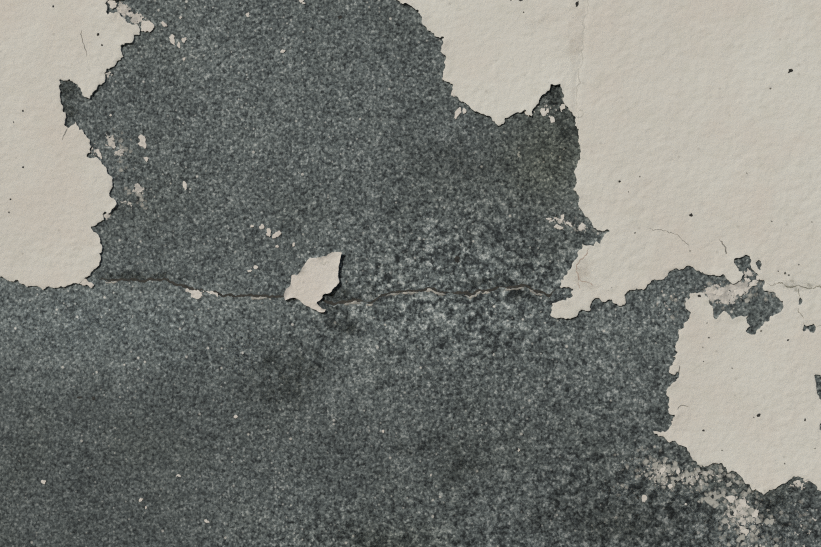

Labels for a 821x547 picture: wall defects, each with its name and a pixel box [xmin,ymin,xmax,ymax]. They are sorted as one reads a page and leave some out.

crack [99,277,284,300]
peeling [60,0,610,303]
peeling [0,252,821,547]
crack [323,284,555,306]